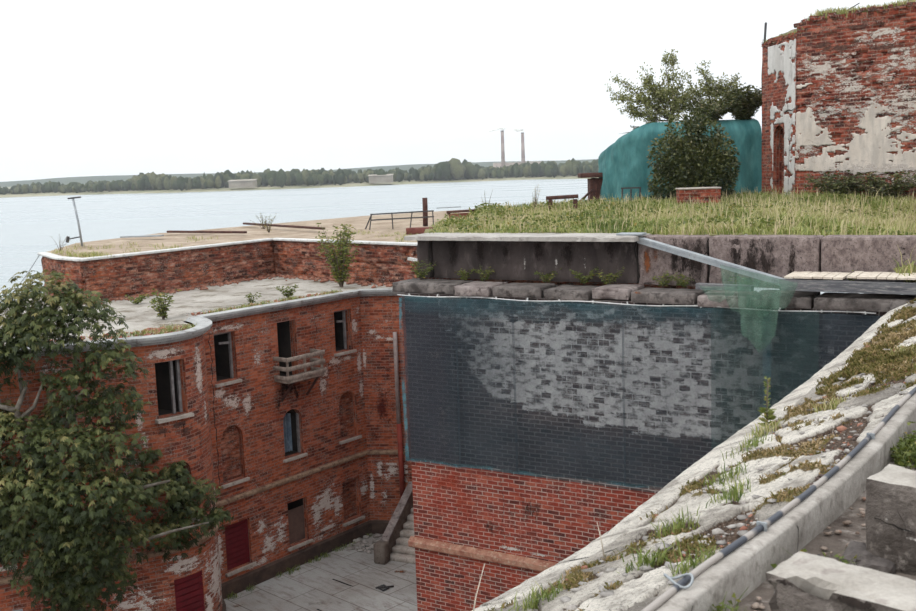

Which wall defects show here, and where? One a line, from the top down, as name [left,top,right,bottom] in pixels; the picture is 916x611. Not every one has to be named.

flaking render [768,22,916,198]
peeling [111,534,224,611]
peeling [248,516,288,570]
peeling [309,483,343,542]